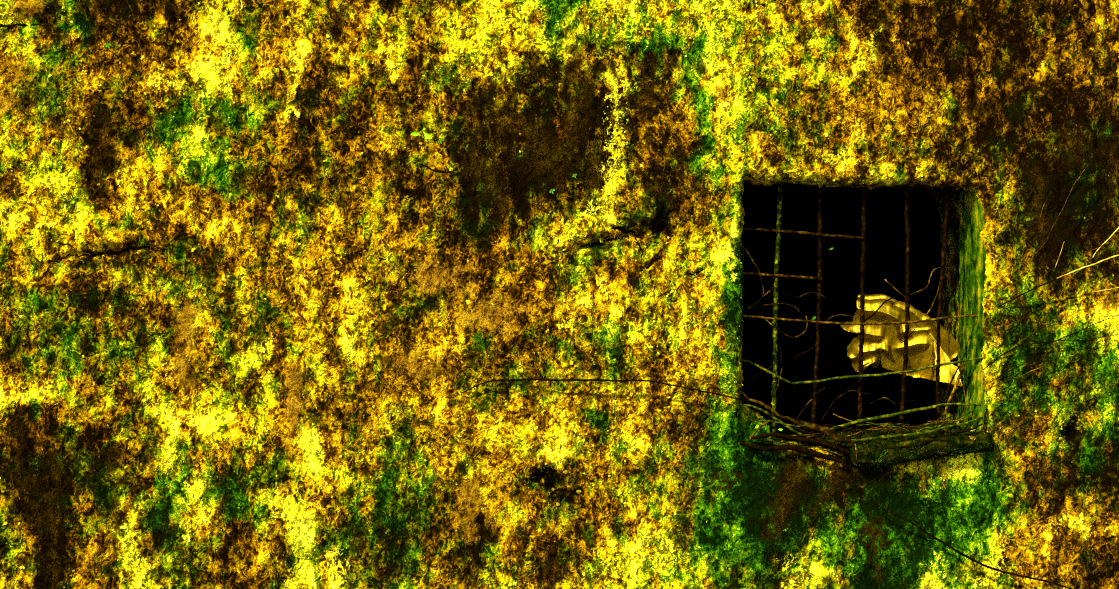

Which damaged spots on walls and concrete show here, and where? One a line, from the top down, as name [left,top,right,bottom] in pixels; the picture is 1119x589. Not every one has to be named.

damp [452,27,707,247]